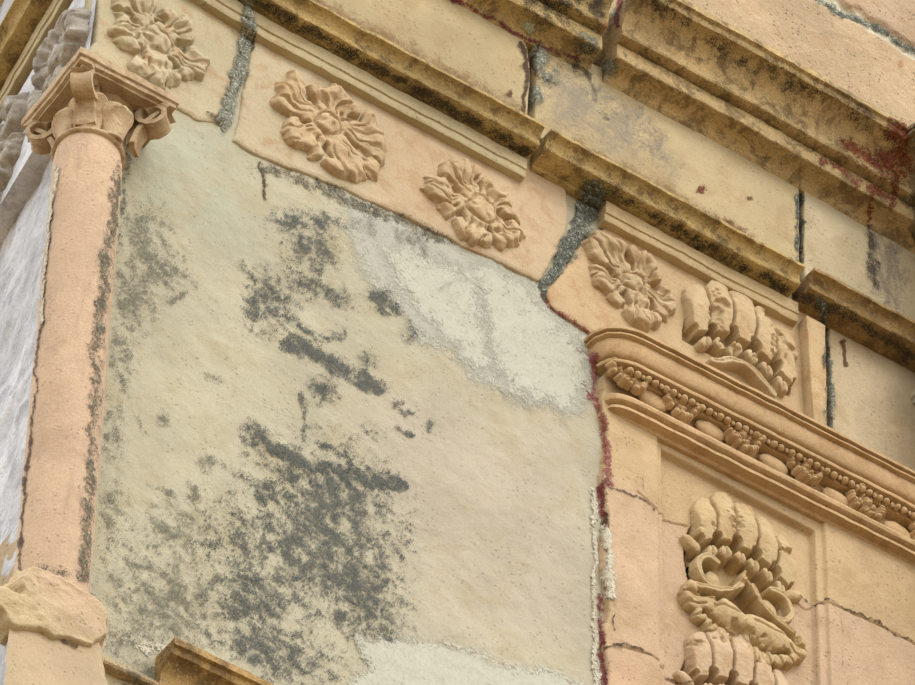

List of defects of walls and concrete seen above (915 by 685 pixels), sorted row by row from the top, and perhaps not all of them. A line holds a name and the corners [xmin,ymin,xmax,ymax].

rust [818,115,915,223]
peeling [374,242,590,411]
mould [76,153,453,685]
crack [540,293,655,685]
crack [800,594,912,641]